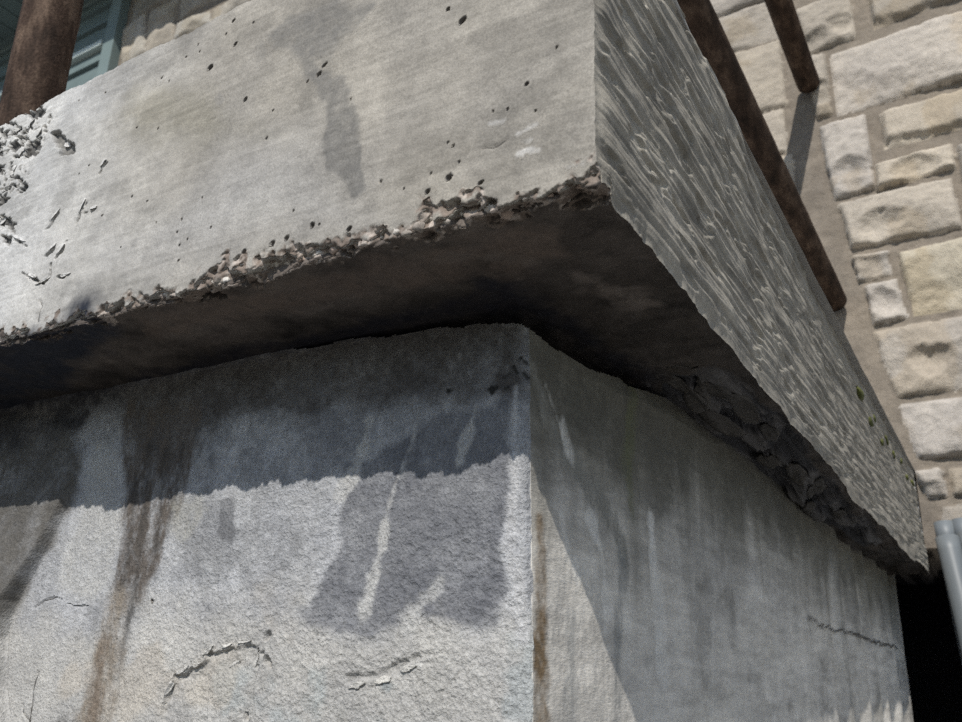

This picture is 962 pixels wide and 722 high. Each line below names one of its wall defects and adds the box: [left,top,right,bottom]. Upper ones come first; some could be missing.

spalling [0,105,76,259]
spalling [0,146,612,347]
damp [253,0,379,205]
damp [0,219,855,722]
spalling [628,364,885,547]
damp [861,571,884,722]